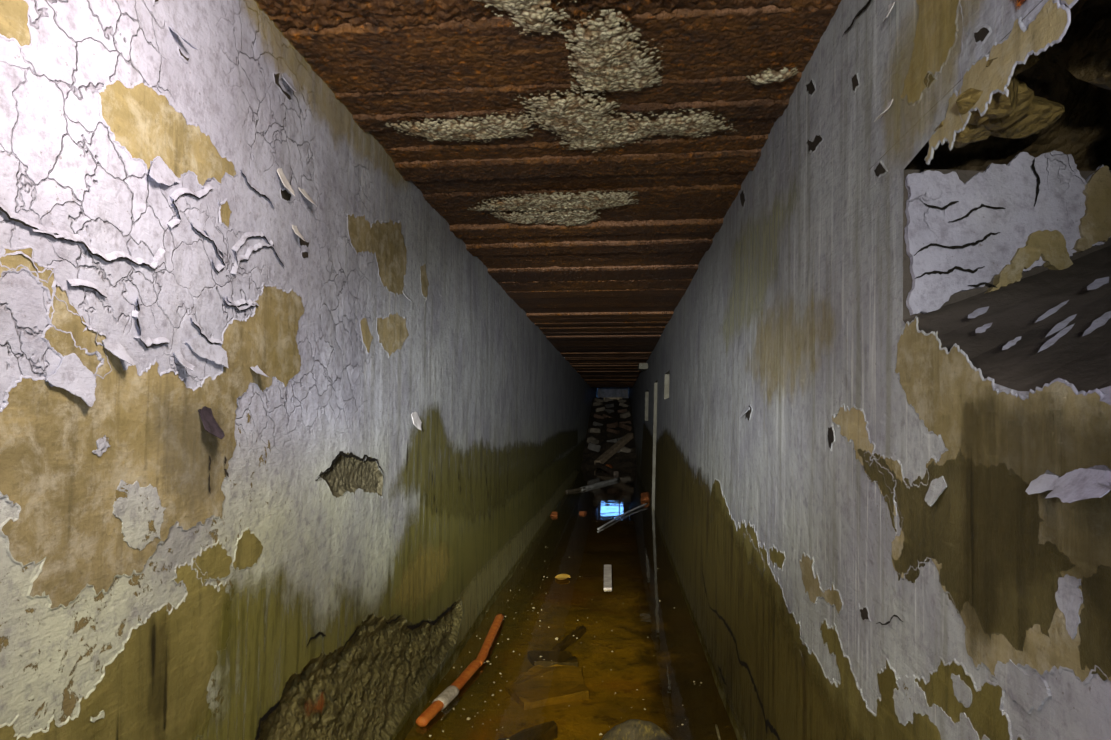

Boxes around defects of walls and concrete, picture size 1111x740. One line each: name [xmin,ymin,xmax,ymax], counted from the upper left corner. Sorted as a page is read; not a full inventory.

crack [842,0,871,37]
peeling [94,78,238,189]
crack [0,169,285,312]
crack [131,298,170,348]
peeling [0,245,305,611]
crack [191,317,223,344]
spalling [316,450,383,499]
peeling [702,0,1111,740]
peeling [0,527,263,740]
damp [152,625,166,729]
damp [192,406,585,740]
damp [640,421,858,740]